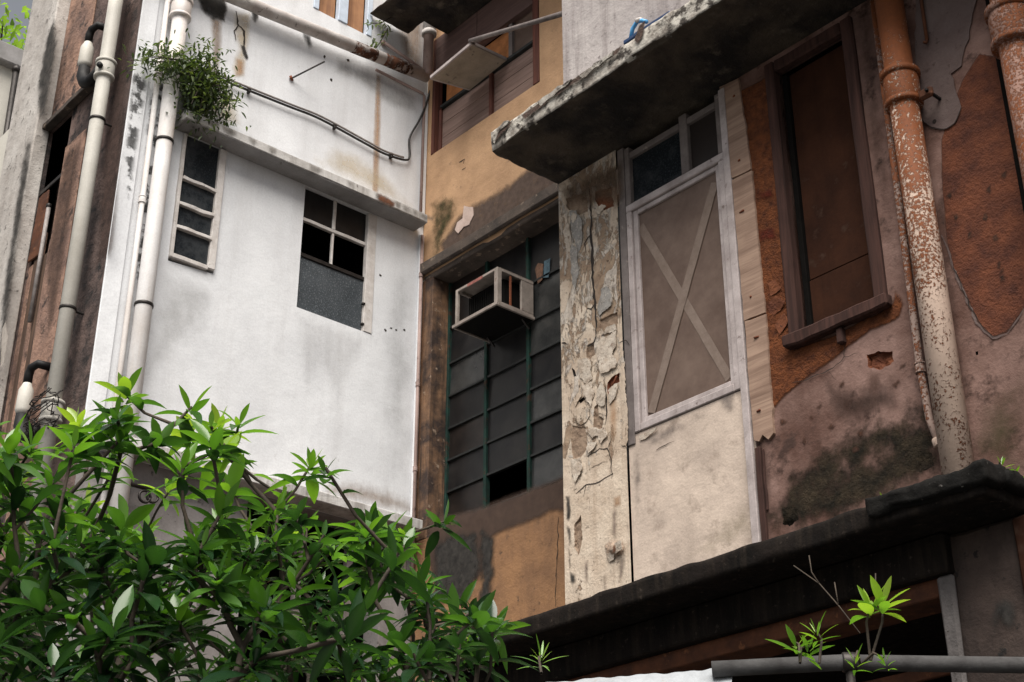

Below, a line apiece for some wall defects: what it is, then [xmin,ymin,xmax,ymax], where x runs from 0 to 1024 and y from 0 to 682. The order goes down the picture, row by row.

spalling [634,21,645,43]
leakage [100,8,163,255]
leakage [138,166,153,277]
corrosion [350,42,411,206]
peeling [455,206,474,233]
leakage [442,170,555,250]
peeling [491,46,621,144]
peeling [563,197,614,290]
crack [562,204,630,347]
flaking render [741,79,904,406]
flaking render [914,0,1024,339]